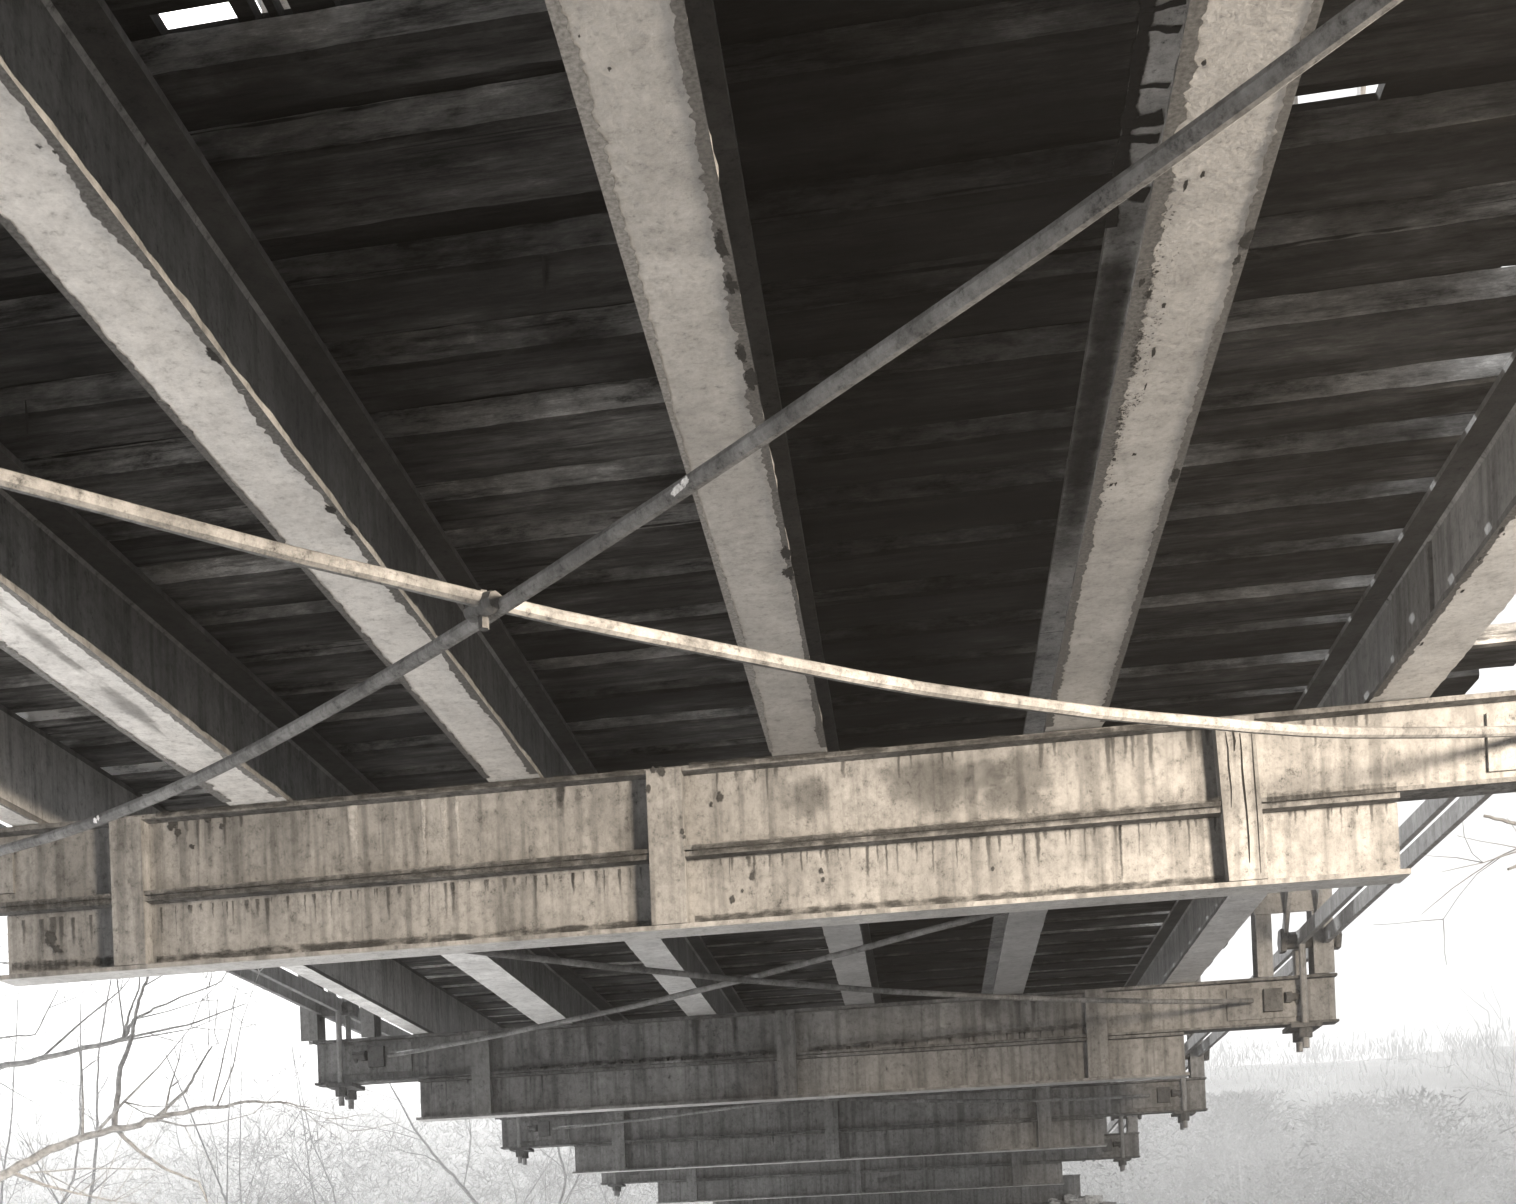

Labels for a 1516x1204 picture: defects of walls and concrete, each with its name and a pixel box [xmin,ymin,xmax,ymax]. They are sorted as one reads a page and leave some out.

peeling [670,0,764,427]
peeling [1162,0,1208,143]
peeling [761,443,827,748]
peeling [1045,164,1205,727]
peeling [1373,504,1516,697]